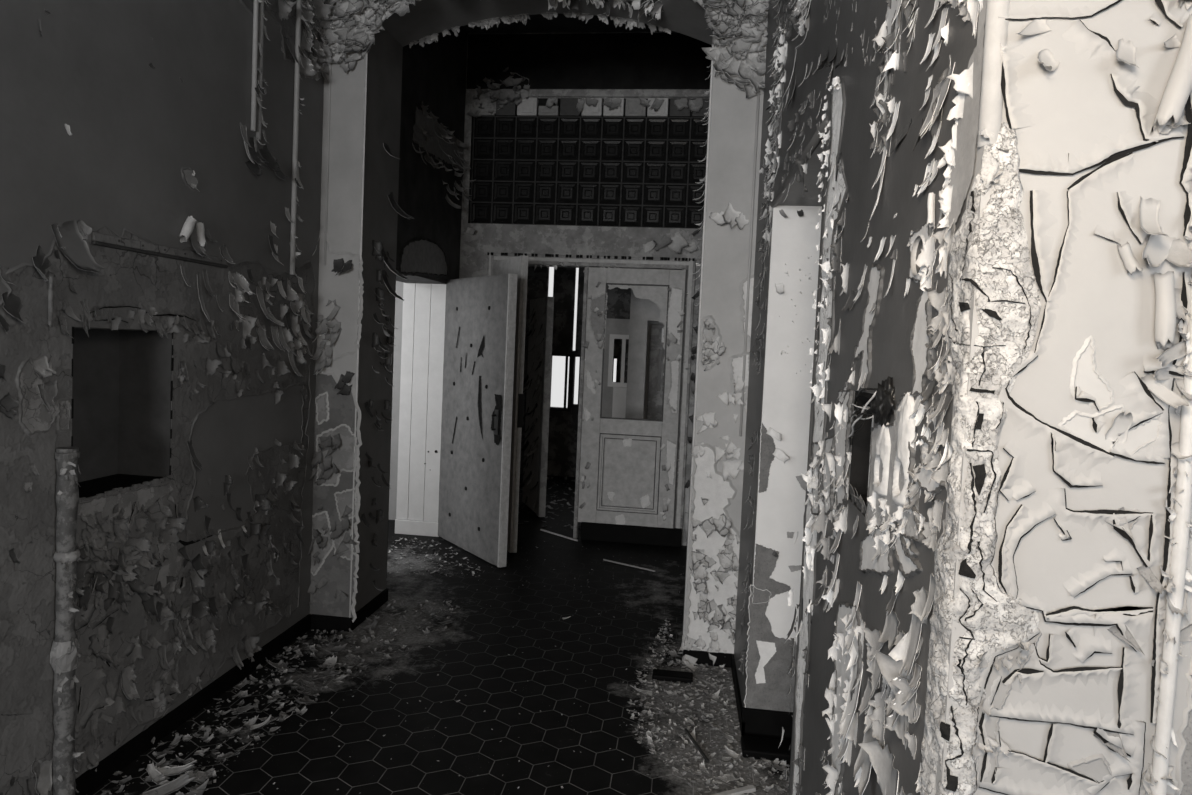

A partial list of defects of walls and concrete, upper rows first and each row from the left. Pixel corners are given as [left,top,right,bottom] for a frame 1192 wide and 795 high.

peeling [239,0,421,82]
peeling [467,66,530,118]
flaking render [410,101,475,209]
peeling [589,282,608,350]
spalling [640,0,1042,795]
crack [977,0,1192,795]
peeling [1058,335,1162,458]
flaking render [0,221,407,795]
peeling [1104,507,1140,539]
peeling [1163,442,1192,550]
flaking render [1107,564,1192,795]
peeling [1067,731,1131,783]